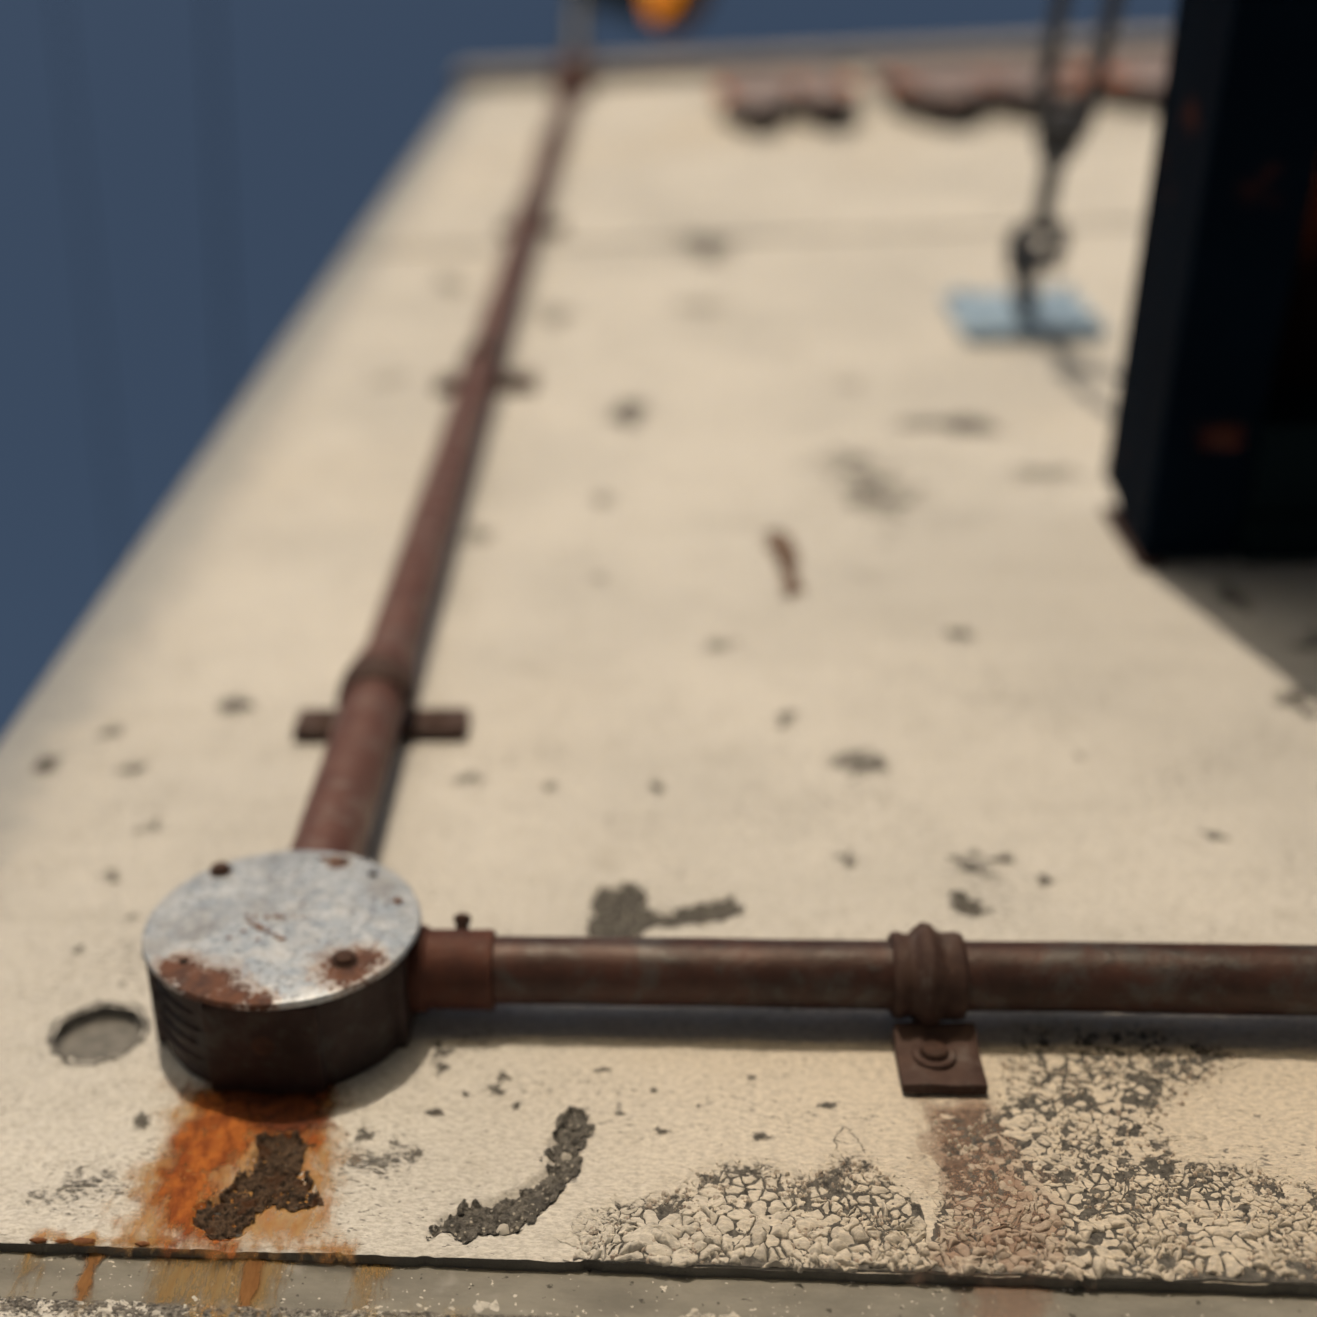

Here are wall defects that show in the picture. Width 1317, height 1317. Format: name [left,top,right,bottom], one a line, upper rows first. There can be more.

spalling [586,881,745,937]
peeling [463,1071,520,1111]
corrosion [115,1084,342,1317]
spalling [192,1130,324,1240]
peeling [333,1126,430,1183]
spalling [426,1106,595,1244]
peeling [541,1012,1317,1283]
corrosion [23,1230,103,1301]